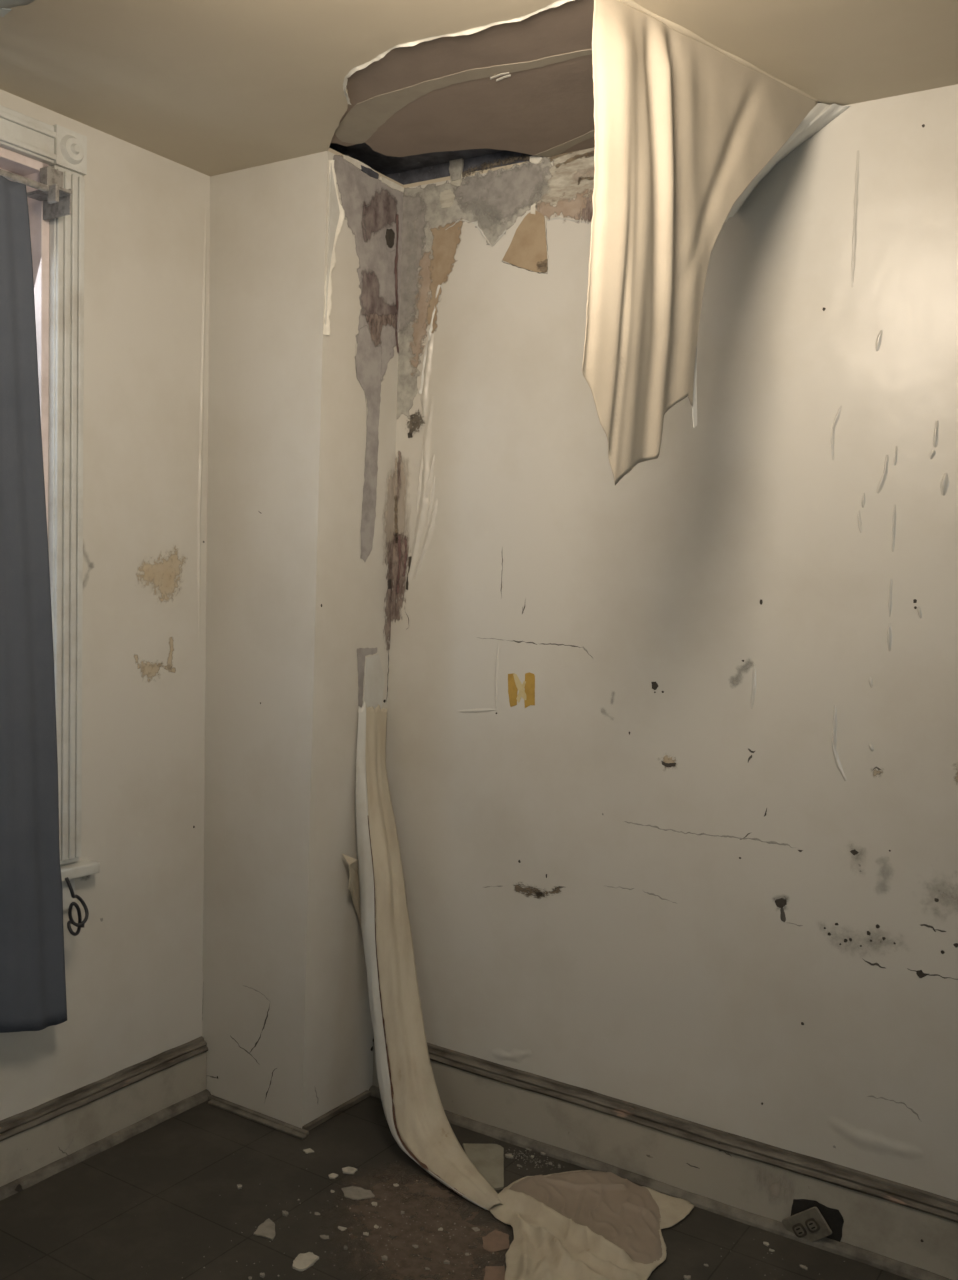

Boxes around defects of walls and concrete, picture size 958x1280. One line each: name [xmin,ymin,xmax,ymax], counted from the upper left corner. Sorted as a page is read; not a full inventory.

peeling [323,0,851,561]
crack [231,985,277,1099]
peeling [329,1167,375,1200]
peeling [342,648,694,1280]